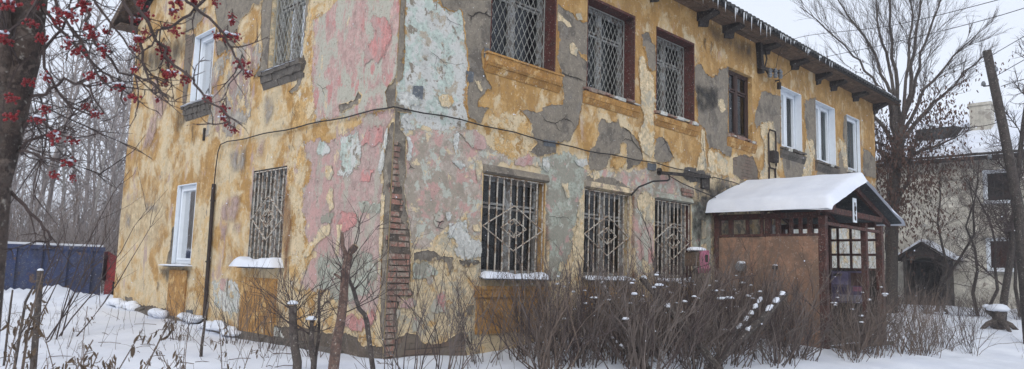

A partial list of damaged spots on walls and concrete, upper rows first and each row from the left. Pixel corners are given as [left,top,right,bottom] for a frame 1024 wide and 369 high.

peeling [274,0,849,359]
peeling [831,228,876,268]